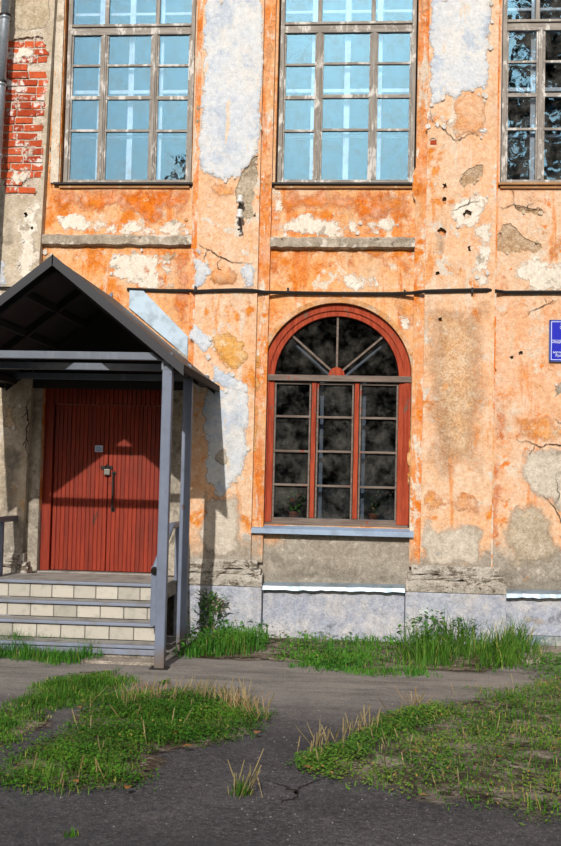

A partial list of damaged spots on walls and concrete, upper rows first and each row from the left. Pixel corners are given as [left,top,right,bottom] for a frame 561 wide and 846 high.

flaking render [1,31,52,277]
peeling [196,0,264,220]
peeling [425,0,494,145]
peeling [451,164,561,290]
peeling [189,324,250,497]